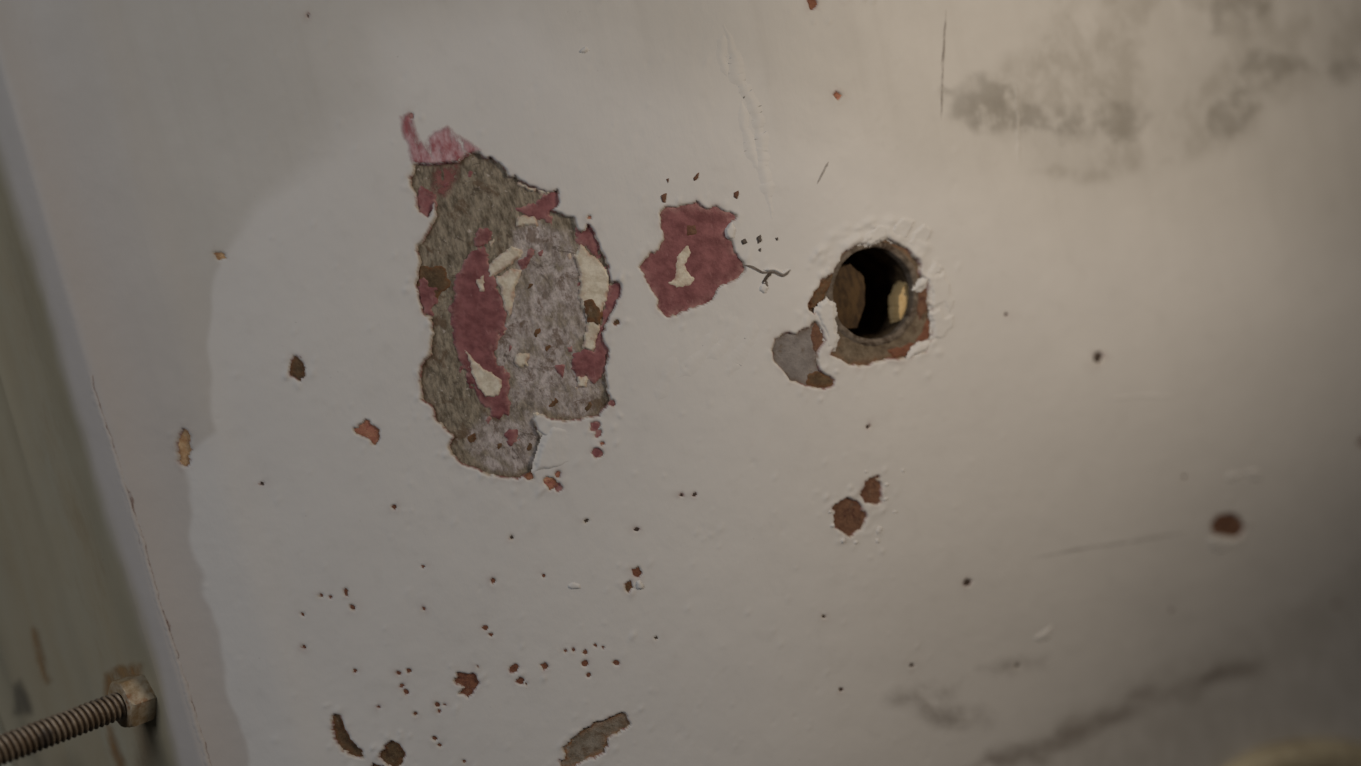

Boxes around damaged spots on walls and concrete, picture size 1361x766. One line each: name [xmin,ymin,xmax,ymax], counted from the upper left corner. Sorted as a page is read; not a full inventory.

peeling [640,178,744,316]
peeling [857,225,886,247]
peeling [402,113,621,491]
peeling [772,274,840,388]
peeling [906,261,954,360]
peeling [832,476,881,536]
peeling [1210,513,1243,537]
peeling [333,714,405,766]
peeling [561,712,630,766]